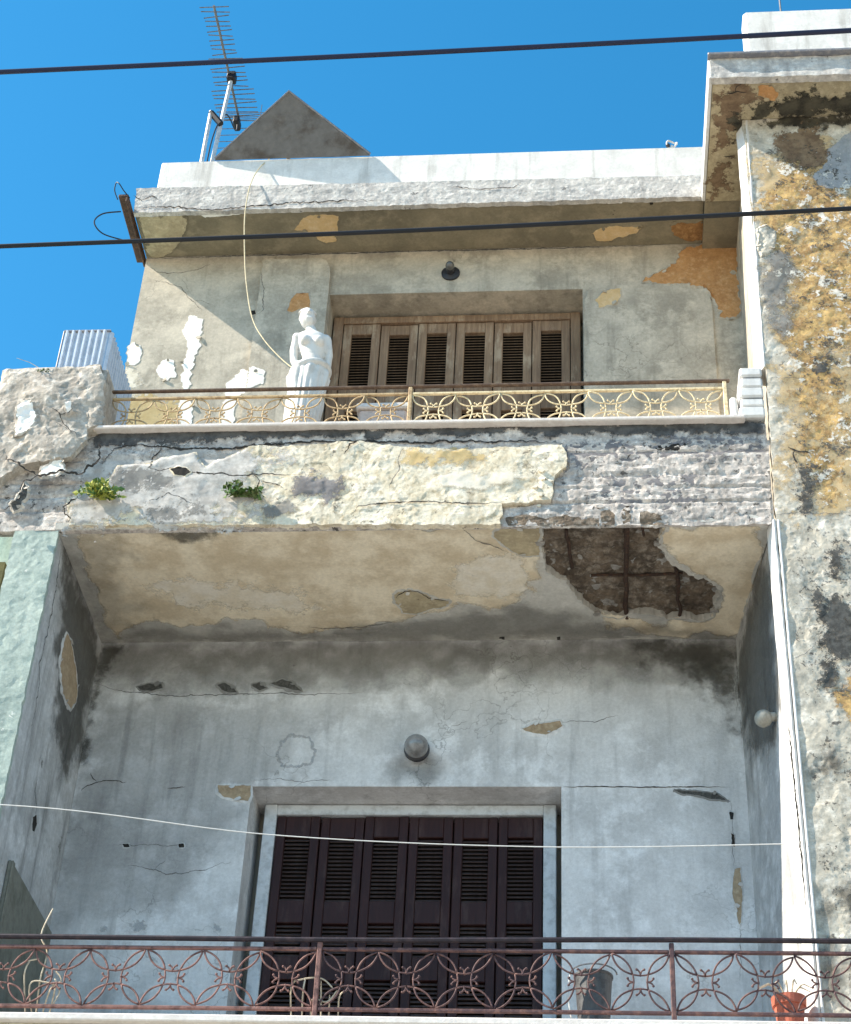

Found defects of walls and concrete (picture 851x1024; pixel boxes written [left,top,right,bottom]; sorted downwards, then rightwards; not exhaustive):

peeling [291,212,341,245]
peeling [125,342,143,366]
peeling [155,315,204,424]
flaking render [491,135,851,623]
water stain [725,84,851,703]
crack [4,409,557,522]
water stain [47,366,778,774]
flaking render [58,631,79,712]
flaking render [251,678,303,693]
flaking render [519,719,565,737]
crack [577,786,735,861]
peeling [731,867,744,926]